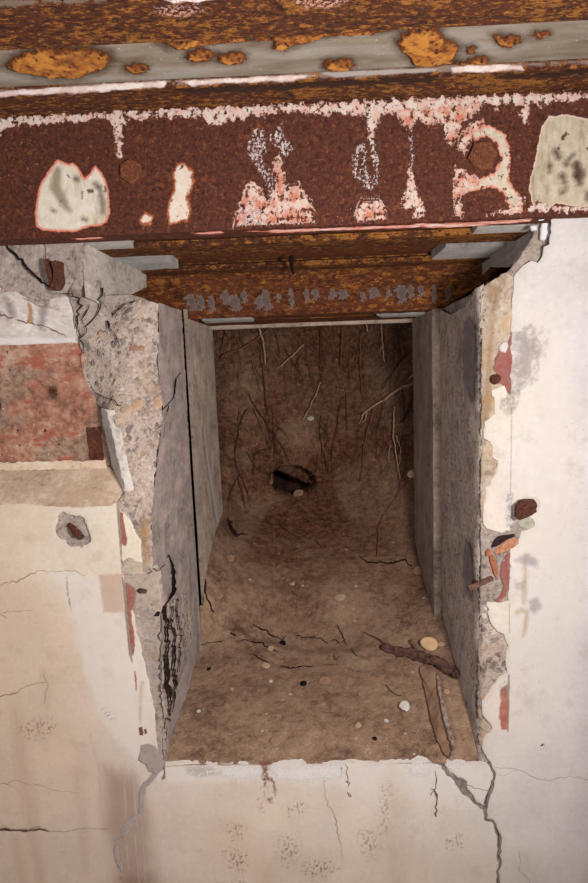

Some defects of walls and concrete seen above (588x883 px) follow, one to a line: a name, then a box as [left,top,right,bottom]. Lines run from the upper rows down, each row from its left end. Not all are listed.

corrosion [2,46,115,79]
corrosion [155,28,490,67]
corrosion [322,58,356,71]
corrosion [493,34,522,48]
corrosion [51,169,68,208]
corrosion [561,162,583,183]
crack [0,244,120,368]
peeling [0,90,588,766]
corrosion [491,534,515,548]
crack [0,570,84,586]
crack [0,744,166,879]
crack [430,761,588,883]